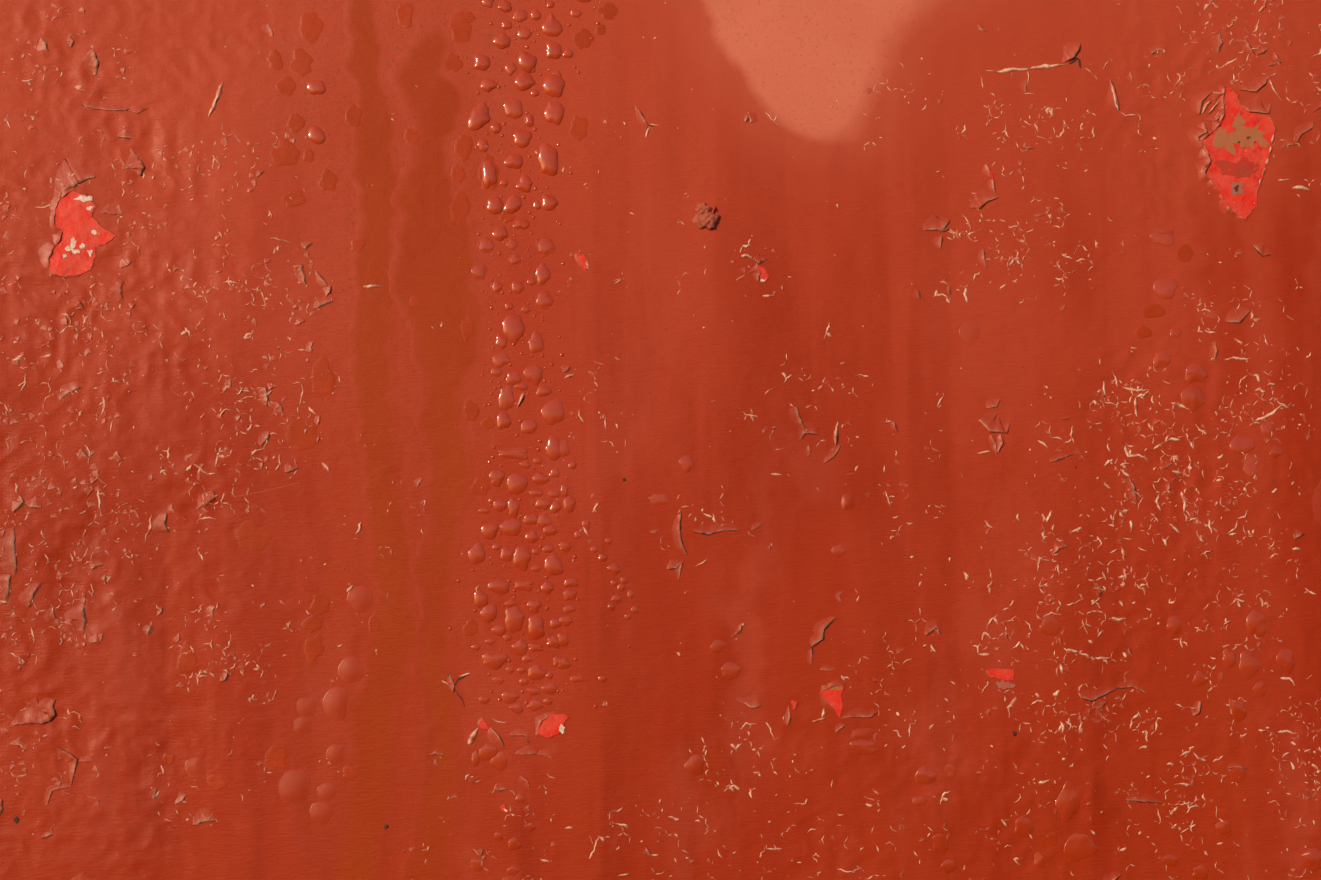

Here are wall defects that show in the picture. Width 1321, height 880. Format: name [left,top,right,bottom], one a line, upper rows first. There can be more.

peeling [1,4,138,103]
water stain [573,2,618,50]
peeling [1119,0,1321,222]
peeling [730,235,790,298]
peeling [0,82,357,682]
water stain [0,0,555,880]
peeling [737,353,873,477]
peeling [812,280,1321,880]
peeling [167,602,300,724]
peeling [535,711,569,739]
peeling [589,798,742,879]
peeling [689,695,949,880]